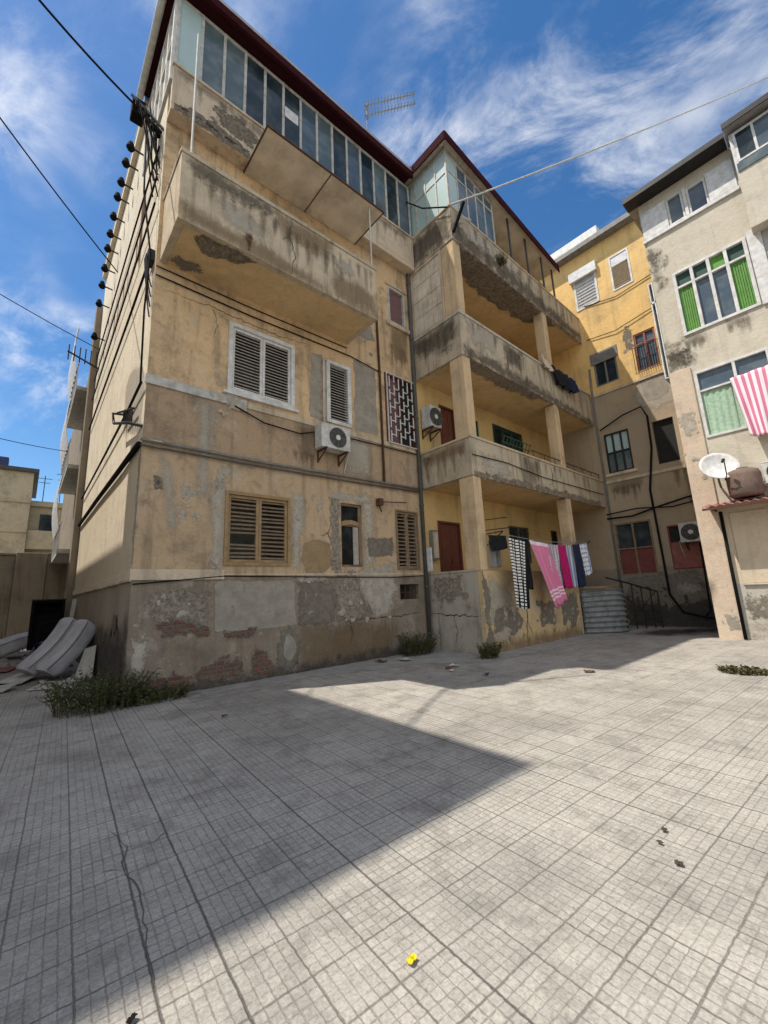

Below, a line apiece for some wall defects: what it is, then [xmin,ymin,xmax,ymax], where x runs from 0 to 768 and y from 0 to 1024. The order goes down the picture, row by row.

spalling [174,103,259,158]
water stain [191,162,328,251]
spalling [194,234,257,264]
water stain [335,275,373,312]
spalling [459,219,555,327]
water stain [647,250,663,288]
water stain [391,319,455,362]
water stain [465,345,591,423]
flaking render [130,586,273,692]
crack [342,612,478,644]
flaking render [536,592,581,628]
crack [104,829,168,1004]